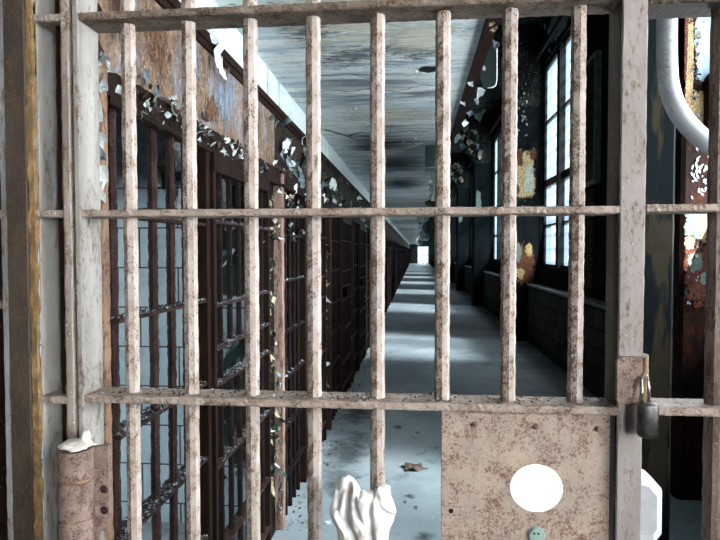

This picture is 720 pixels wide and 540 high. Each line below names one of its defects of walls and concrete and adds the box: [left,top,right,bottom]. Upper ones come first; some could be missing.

rust [139,31,171,76]
peeling [684,17,711,124]
rust [204,96,219,122]
peeling [196,111,244,165]
leakage [384,126,419,150]
peeling [455,81,486,160]
peeling [258,136,307,209]
leakage [385,159,425,188]
peeling [516,147,537,201]
peeling [691,148,708,199]
peeling [684,214,707,249]
rust [684,242,707,309]